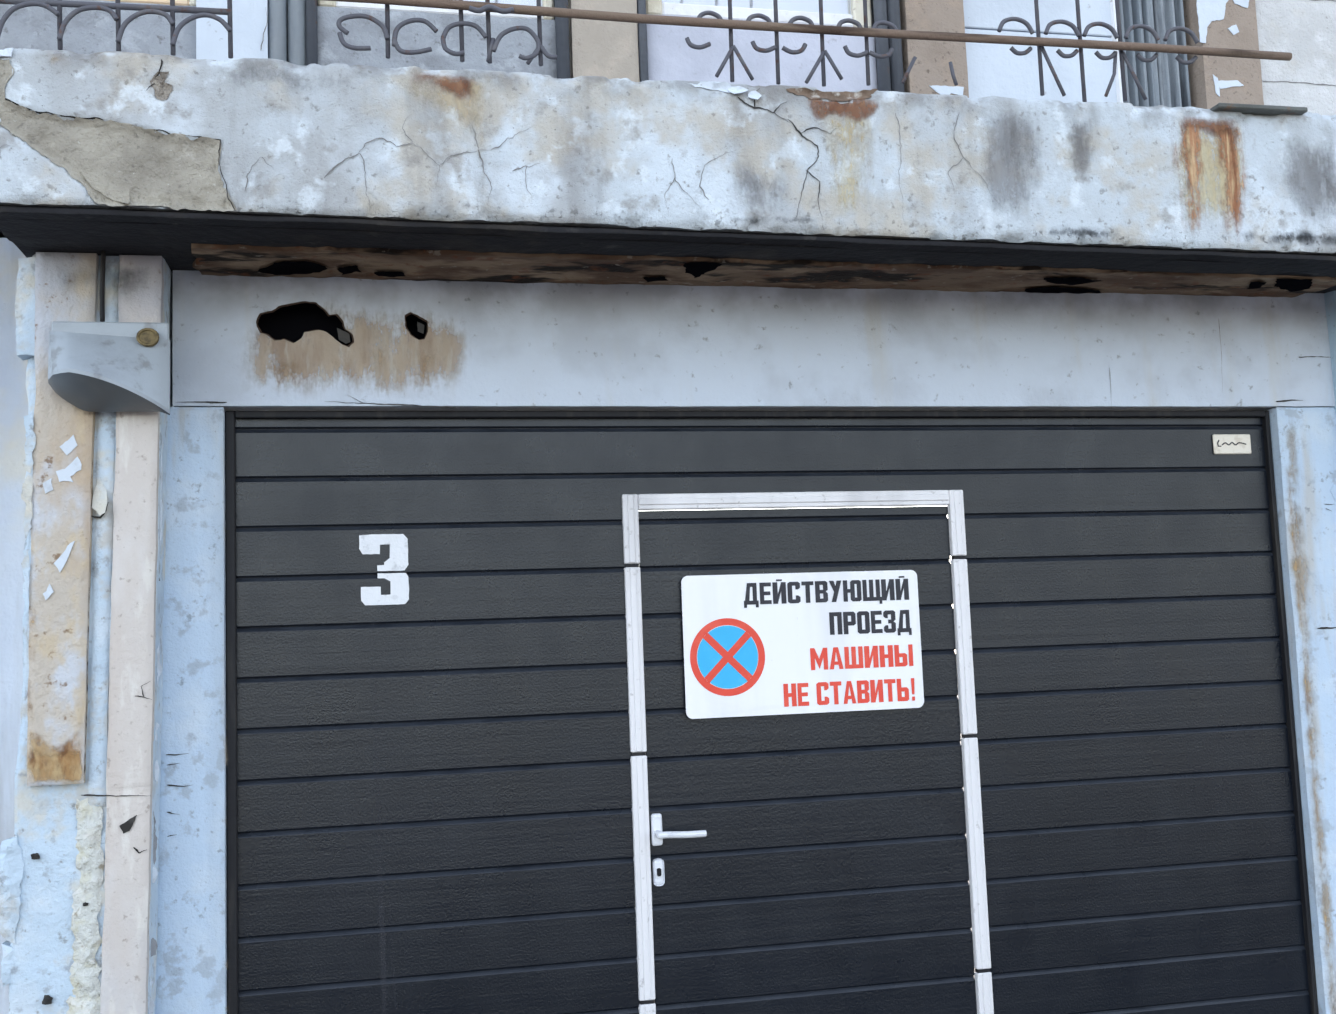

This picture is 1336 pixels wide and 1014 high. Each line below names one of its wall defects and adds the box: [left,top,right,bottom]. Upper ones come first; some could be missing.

spalling [0,48,237,212]
crack [324,114,539,207]
crack [664,152,728,216]
crack [738,88,839,220]
damp [989,123,1029,199]
damp [1074,129,1089,168]
rust [1181,119,1244,226]
damp [1291,153,1336,206]
peeling [21,413,82,617]
rust [1293,556,1306,606]
rust [1323,883,1332,946]